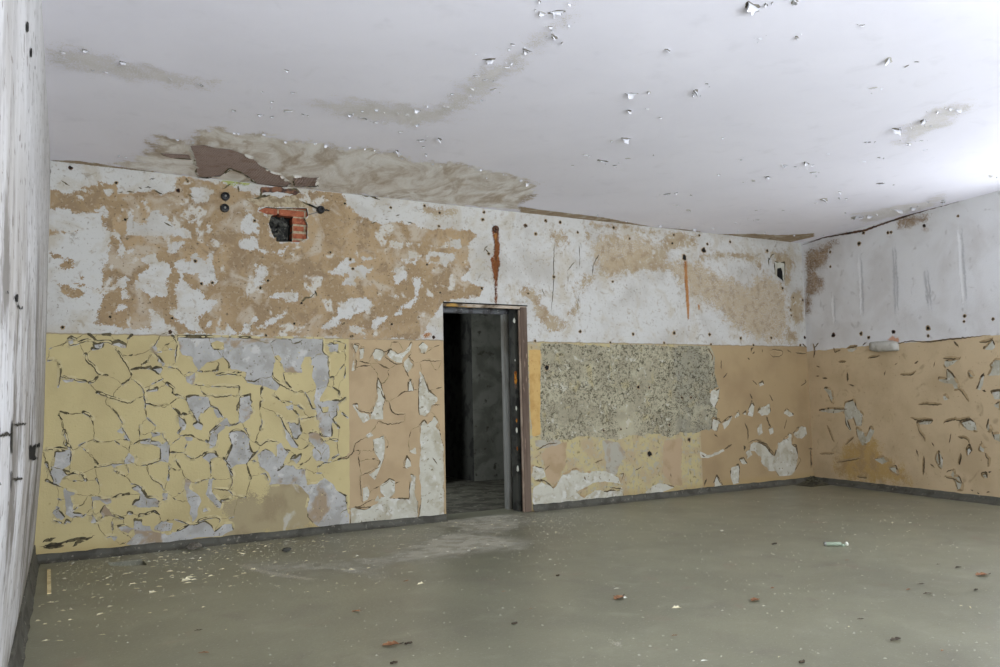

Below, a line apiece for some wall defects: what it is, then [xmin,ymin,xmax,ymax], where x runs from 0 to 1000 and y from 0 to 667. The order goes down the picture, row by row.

peeling [535,0,573,45]
peeling [745,1,773,15]
peeling [890,98,987,146]
damp [52,126,841,350]
corrosion [490,230,500,304]
corrosion [684,260,700,319]
peeling [845,193,950,246]
peeling [30,154,483,545]
peeling [918,337,1000,410]
peeling [911,416,1000,494]